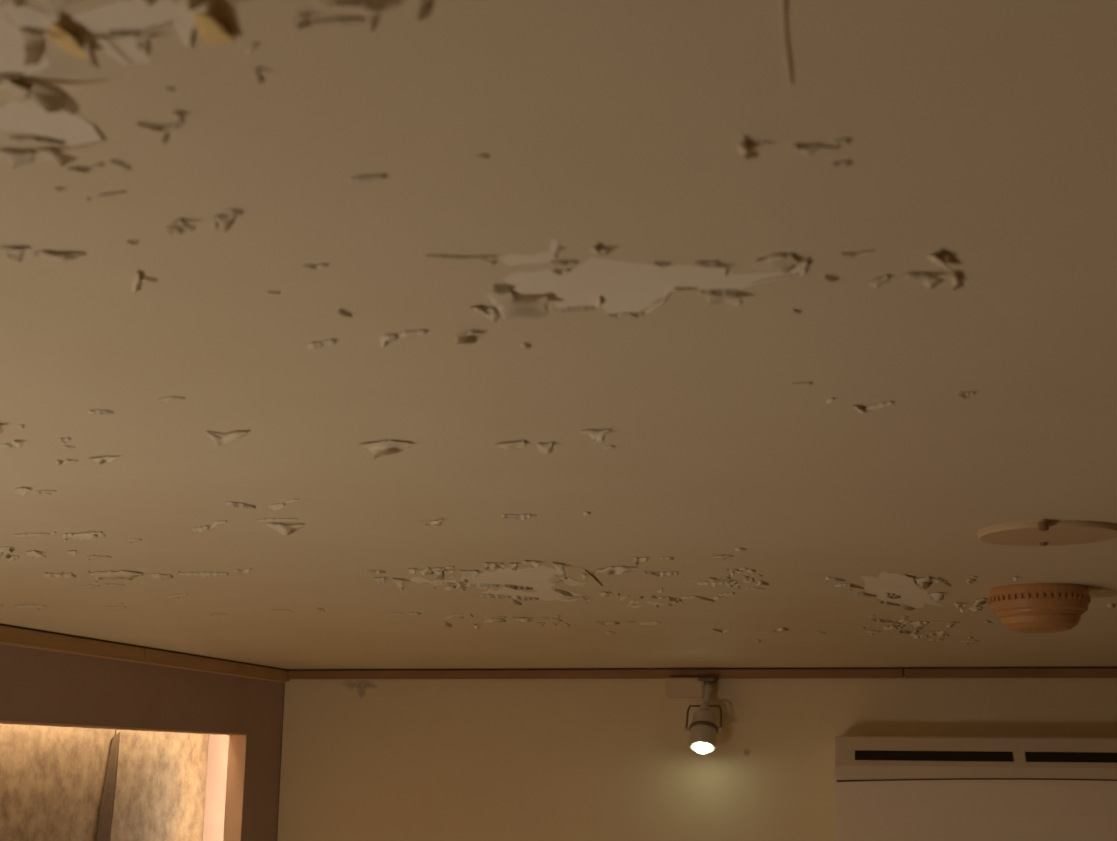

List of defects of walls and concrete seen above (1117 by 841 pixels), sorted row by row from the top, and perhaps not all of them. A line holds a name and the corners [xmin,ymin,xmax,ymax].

peeling [293,0,402,33]
peeling [417,0,434,21]
peeling [0,0,257,173]
peeling [425,237,810,322]
peeling [365,548,769,635]
peeling [825,572,993,645]